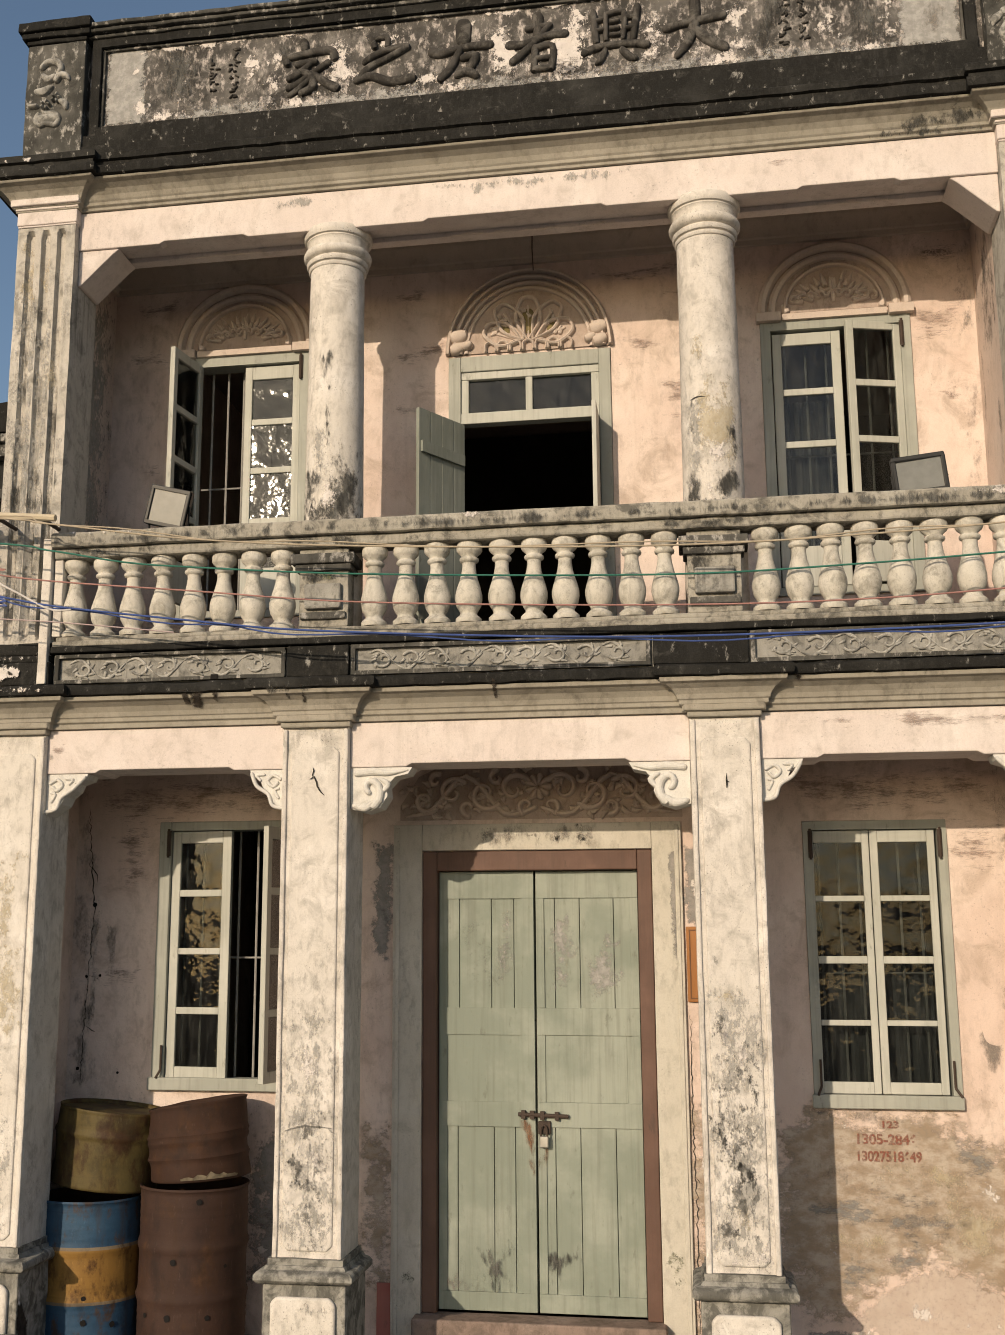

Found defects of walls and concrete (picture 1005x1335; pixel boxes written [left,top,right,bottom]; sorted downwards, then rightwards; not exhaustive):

peeling [105,0,961,125]
leakage [0,244,147,640]
leakage [402,510,546,526]
peeling [687,382,740,501]
leakage [664,503,784,529]
leakage [843,484,1005,504]
leakage [0,874,21,1035]
crack [80,811,98,1079]
flaking render [668,848,696,956]
leakage [984,1038,1000,1070]
flaking render [669,991,1005,1335]